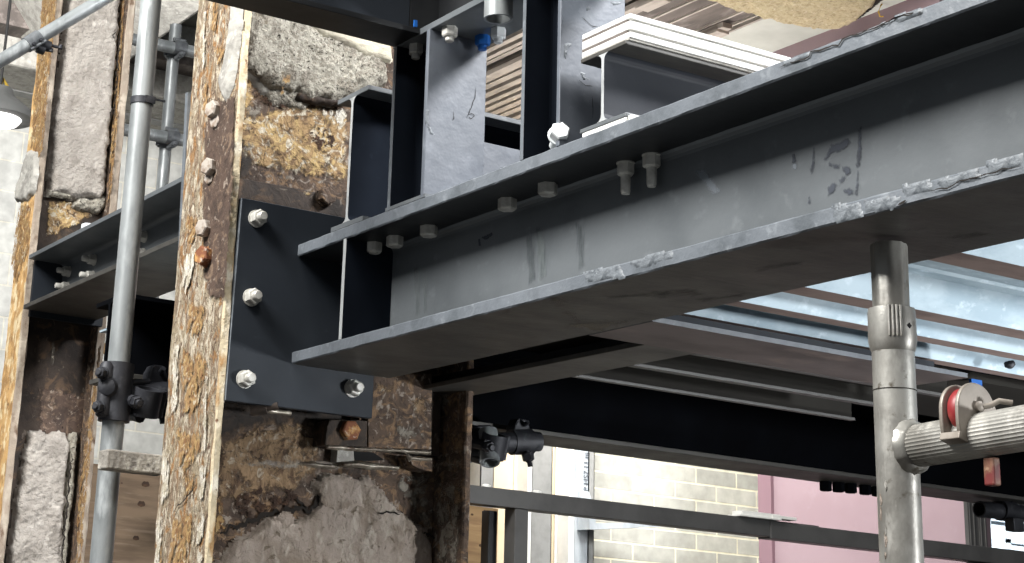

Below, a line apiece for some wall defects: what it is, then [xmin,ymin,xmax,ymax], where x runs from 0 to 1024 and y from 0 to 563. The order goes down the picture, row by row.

corrosion [185,75,348,336]
peeling [831,153,1023,224]
peeling [182,249,196,294]
peeling [583,250,673,283]
peeling [171,345,179,414]
peeling [154,451,171,563]
crack [220,494,320,534]
spalling [193,468,432,563]
crack [379,510,435,539]